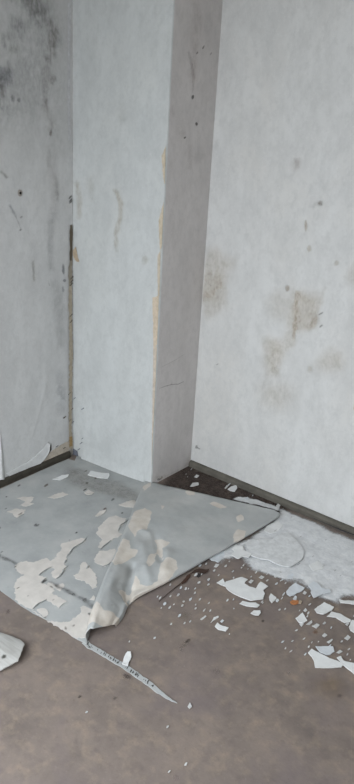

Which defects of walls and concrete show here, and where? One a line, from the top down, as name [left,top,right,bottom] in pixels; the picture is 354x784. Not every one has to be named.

peeling [7,438,83,476]